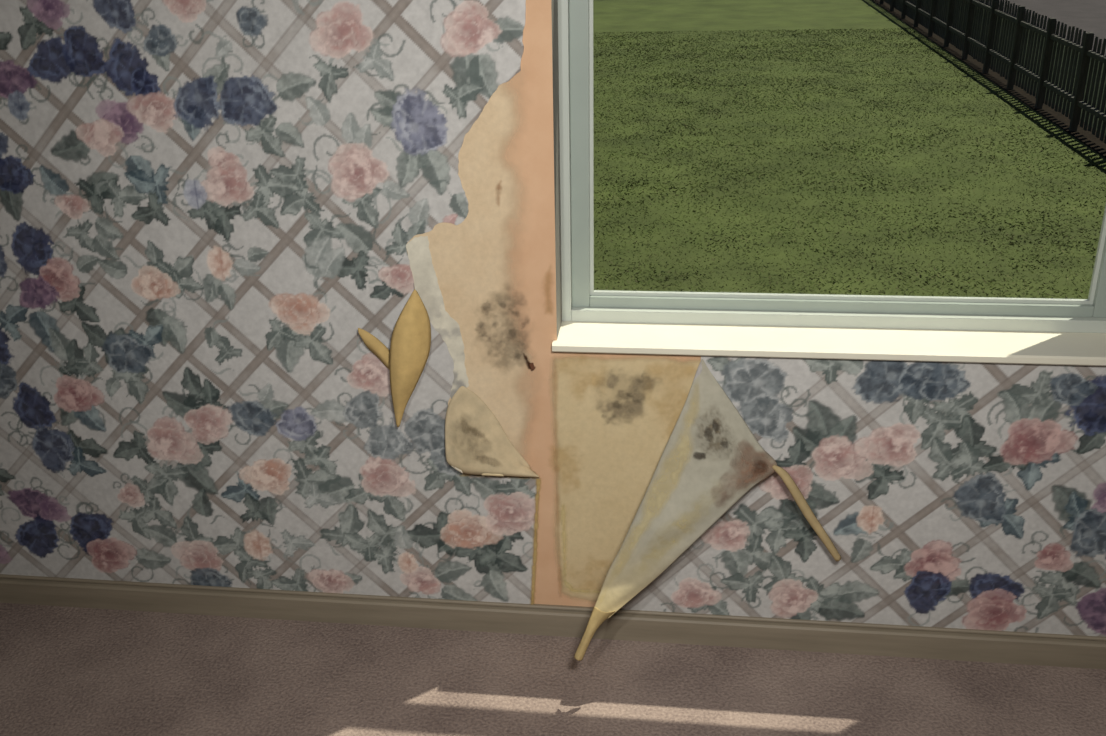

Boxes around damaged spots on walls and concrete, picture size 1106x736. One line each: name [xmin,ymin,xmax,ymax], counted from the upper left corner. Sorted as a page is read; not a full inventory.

peeling [407,82,535,455]
peeling [552,357,701,601]